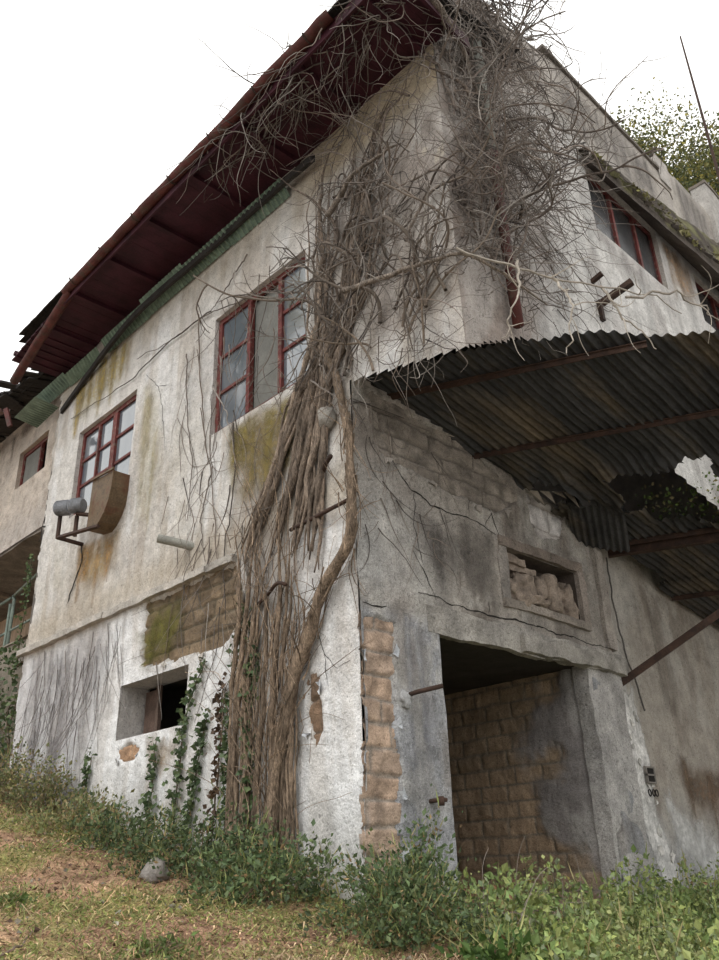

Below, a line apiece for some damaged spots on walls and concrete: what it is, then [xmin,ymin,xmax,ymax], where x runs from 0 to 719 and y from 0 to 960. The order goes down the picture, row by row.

leakage [74,344,126,435]
spalling [368,391,566,540]
crack [393,462,619,648]
spalling [139,566,245,669]
spalling [115,744,139,765]
peeling [302,673,323,746]
spalling [357,610,410,898]
leakage [682,760,719,809]